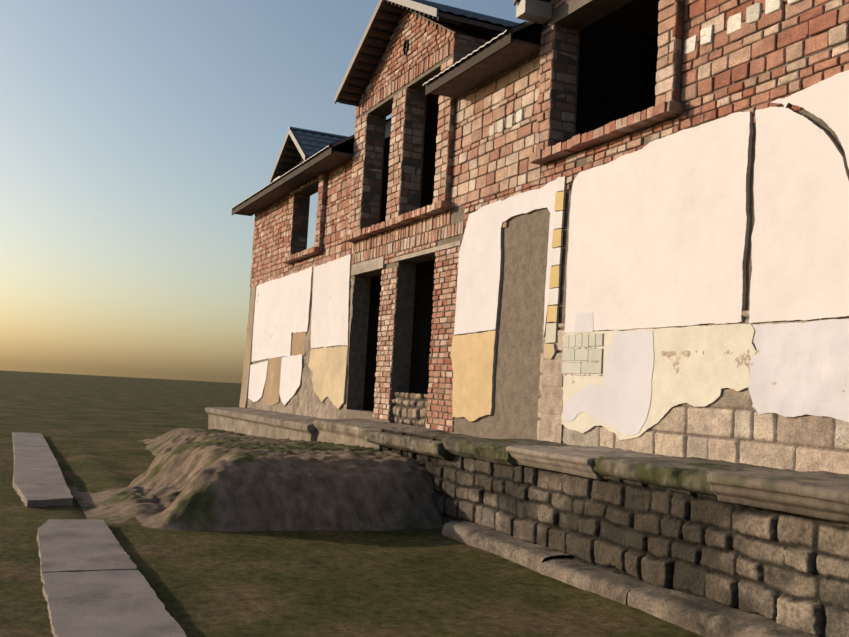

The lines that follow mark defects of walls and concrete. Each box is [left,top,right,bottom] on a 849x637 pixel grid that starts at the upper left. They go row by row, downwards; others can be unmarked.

flaking render [262,332,307,406]